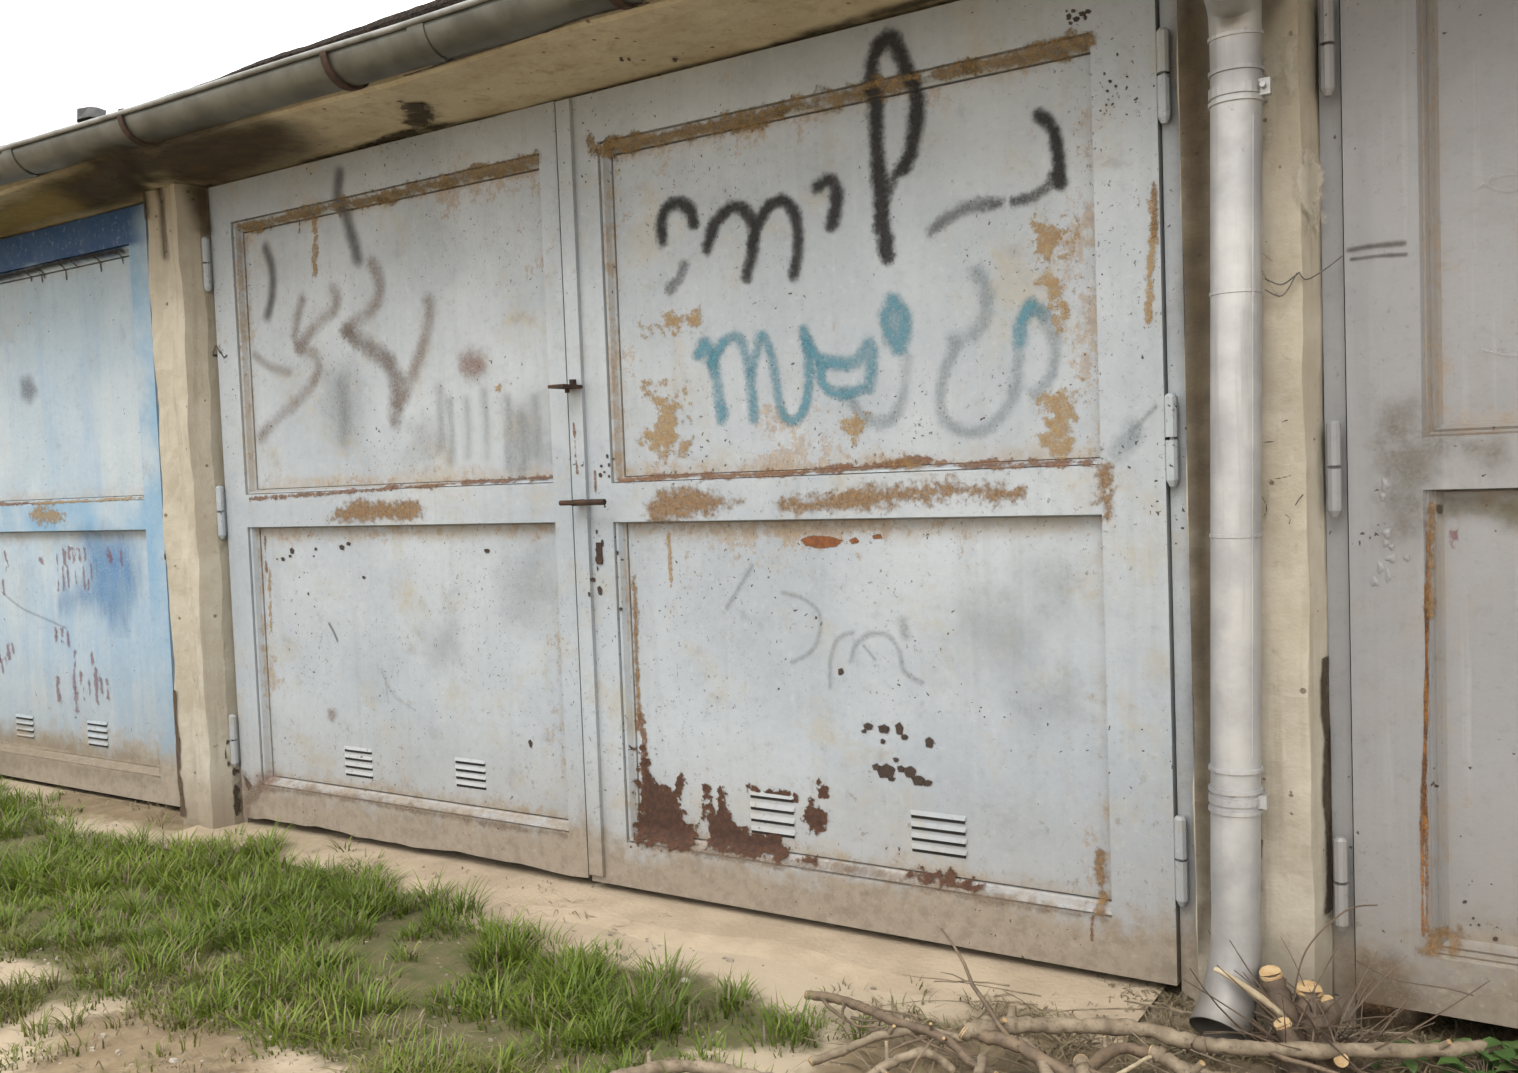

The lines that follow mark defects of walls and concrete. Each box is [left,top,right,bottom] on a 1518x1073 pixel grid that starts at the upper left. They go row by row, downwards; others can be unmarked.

rust [586,28,1096,161]
rust [237,150,539,276]
rust [639,309,701,339]
rust [1030,214,1080,334]
rust [249,475,553,524]
rust [618,375,1113,587]
rust [1419,502,1461,956]